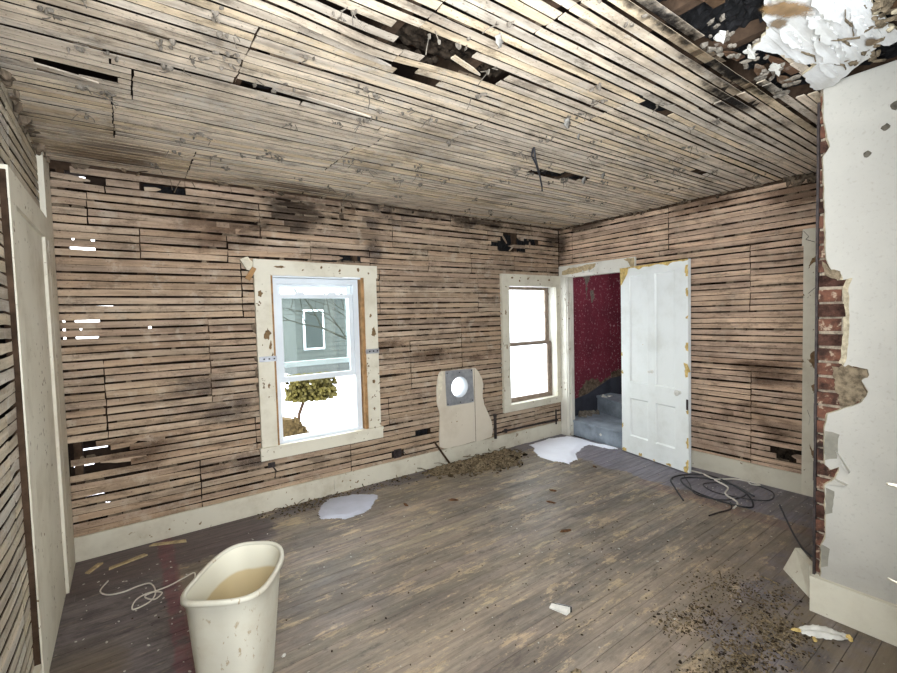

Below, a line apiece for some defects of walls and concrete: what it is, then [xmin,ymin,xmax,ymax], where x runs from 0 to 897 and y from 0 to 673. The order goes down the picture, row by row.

spalling [288,7,397,45]
spalling [380,16,479,65]
spalling [476,33,510,78]
flaking render [844,0,897,66]
flaking render [775,94,869,577]